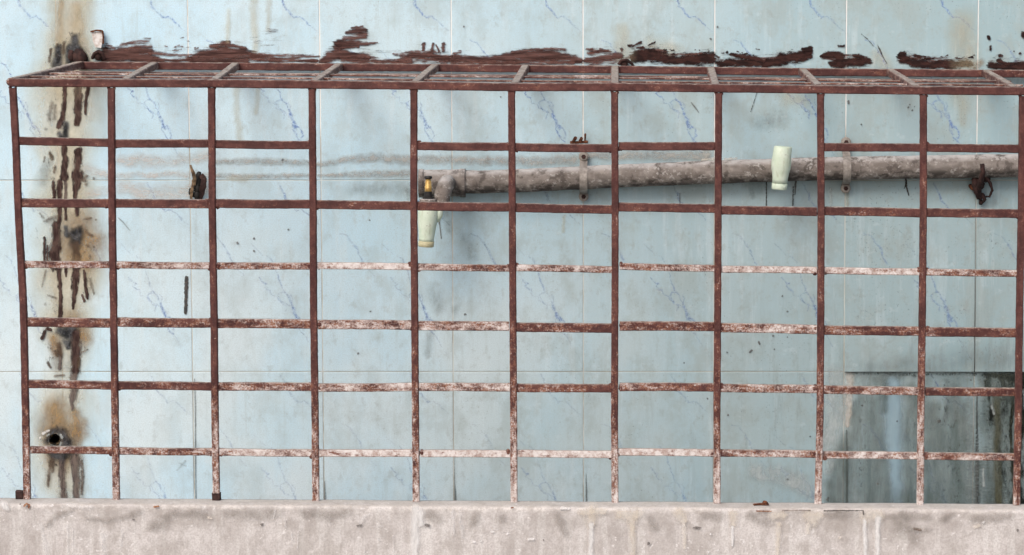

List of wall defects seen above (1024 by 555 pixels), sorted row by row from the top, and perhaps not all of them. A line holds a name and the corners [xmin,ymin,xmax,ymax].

corrosion [48,0,104,76]
corrosion [43,208,100,277]
spalling [49,433,62,445]
corrosion [39,327,89,498]
damp [877,372,929,516]
damp [972,372,1024,504]